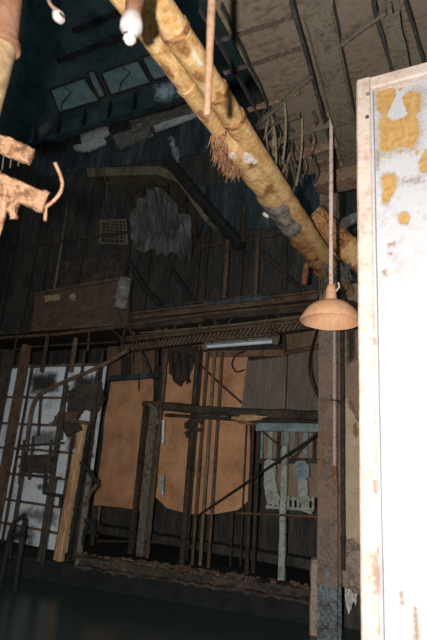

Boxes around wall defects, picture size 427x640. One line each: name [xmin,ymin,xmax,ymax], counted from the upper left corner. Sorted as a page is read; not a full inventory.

peeling [376,87,427,173]
peeling [381,173,398,204]
peeling [398,211,410,225]